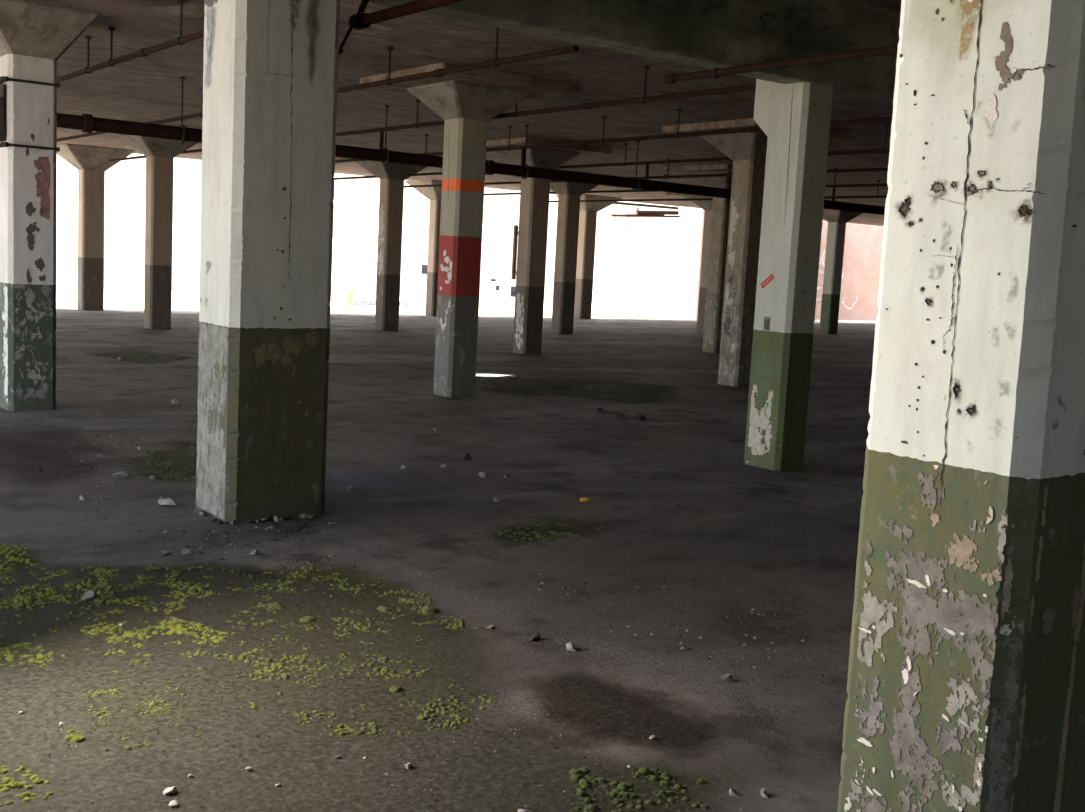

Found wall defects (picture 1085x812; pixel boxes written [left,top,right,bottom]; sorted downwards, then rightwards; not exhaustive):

rust [952,0,981,57]
peeling [982,22,1024,121]
crack [1009,64,1054,80]
peeling [2,133,50,403]
crack [927,0,1045,519]
peeling [746,383,774,463]
peeling [918,455,945,527]
peeling [844,486,1057,812]
peeling [1053,542,1085,812]